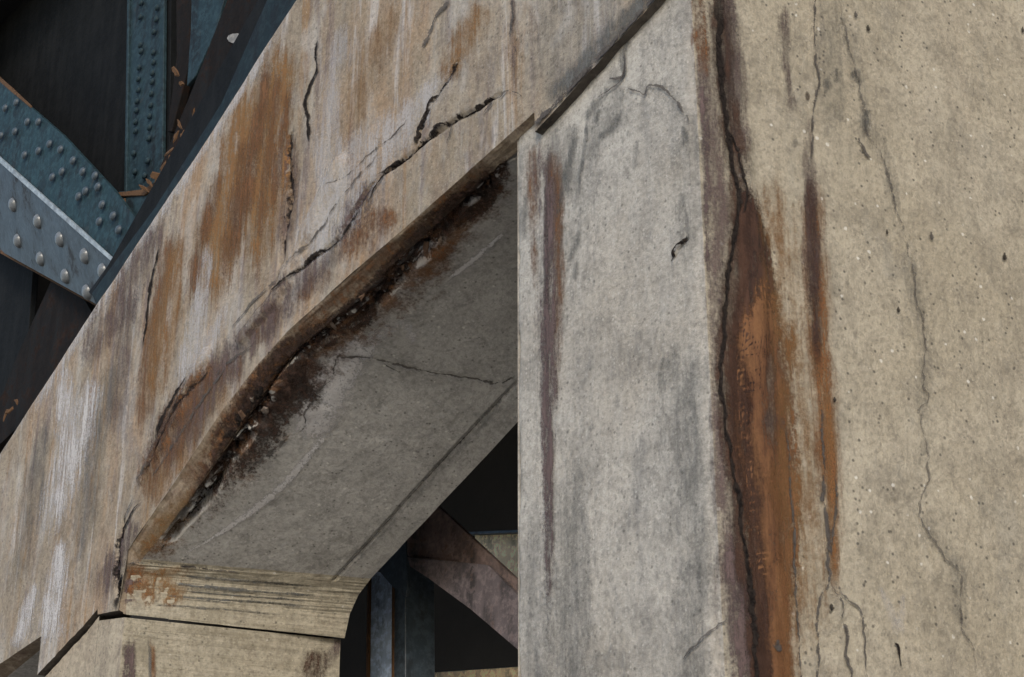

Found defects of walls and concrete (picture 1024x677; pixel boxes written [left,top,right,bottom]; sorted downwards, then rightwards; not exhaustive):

damp [96,522,139,593]
damp [152,83,436,468]
damp [189,324,417,552]
rust [124,45,485,607]
crack [303,41,318,140]
crack [233,64,521,326]
damp [415,240,443,269]
rust [527,144,565,596]
crack [601,0,767,677]
rust [721,150,840,677]
rust [779,7,810,102]
crack [786,410,868,677]